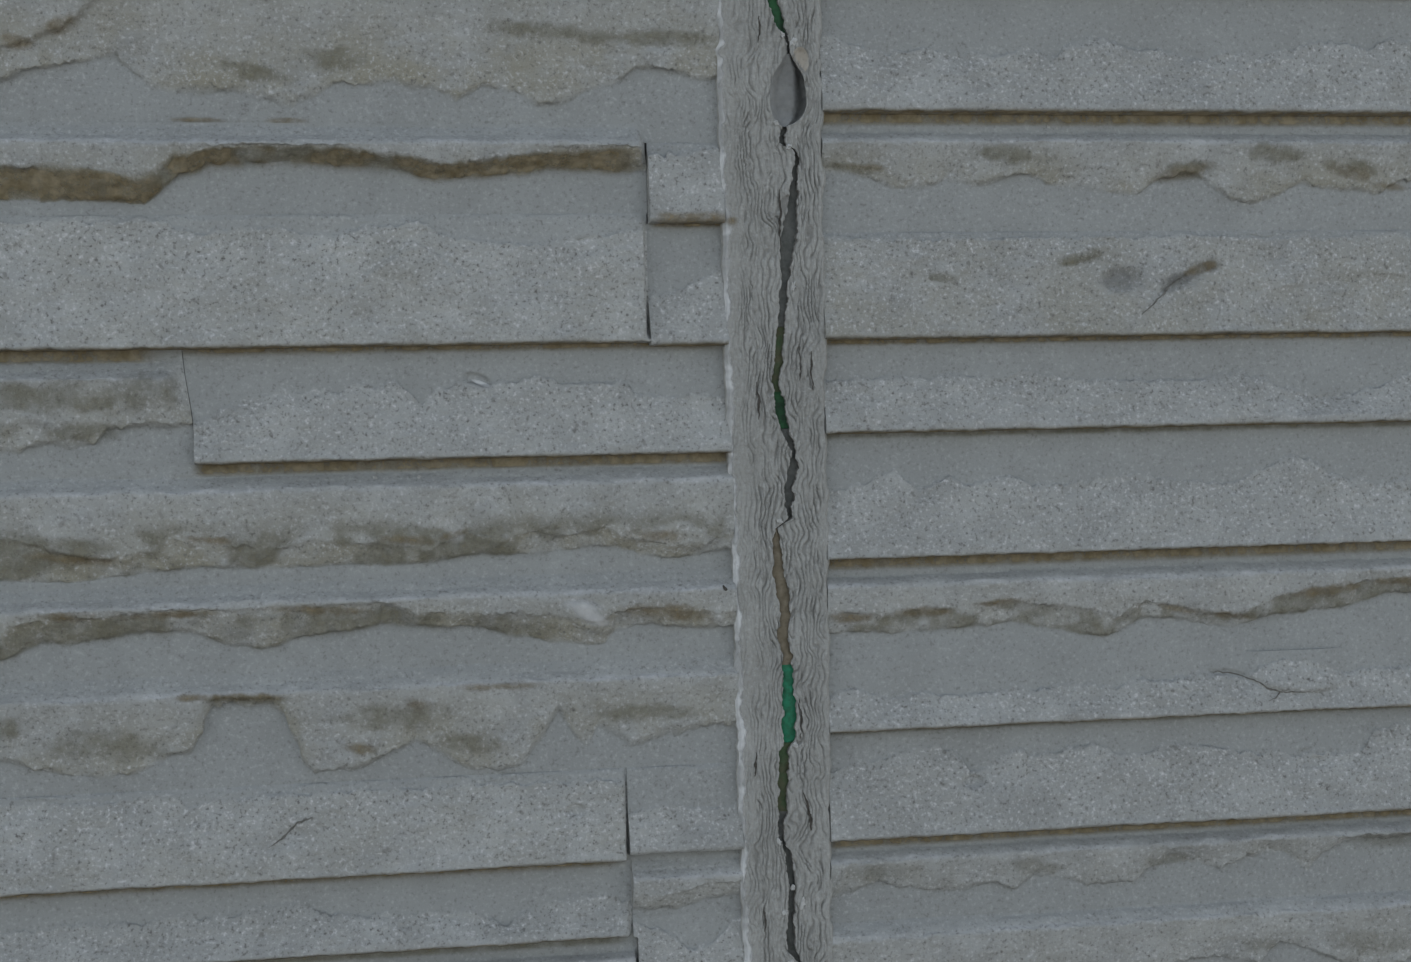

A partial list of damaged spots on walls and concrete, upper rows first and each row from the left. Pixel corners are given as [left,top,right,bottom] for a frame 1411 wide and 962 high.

crack [758,0,797,55]
crack [754,120,814,962]